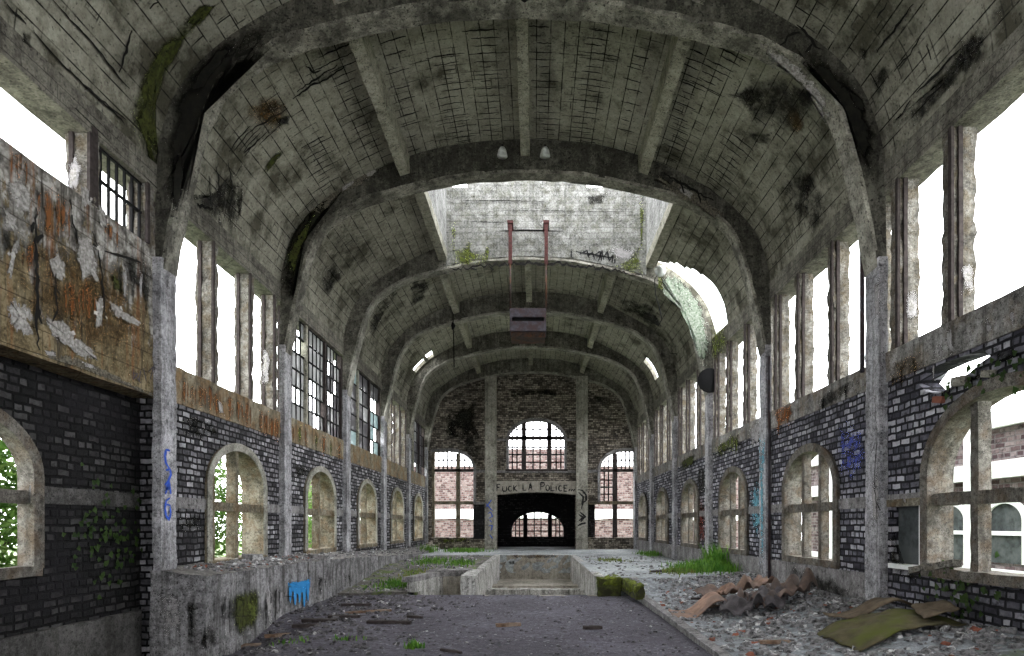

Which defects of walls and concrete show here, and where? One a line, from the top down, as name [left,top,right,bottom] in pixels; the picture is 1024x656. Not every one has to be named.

crack [7,0,132,125]
water stain [149,33,264,211]
crack [197,29,505,222]
water stain [729,81,814,143]
water stain [897,32,984,127]
peeling [3,179,31,283]
crack [31,208,61,350]
rust [21,245,128,354]
peeling [50,237,105,282]
peeling [7,296,154,397]
spalling [68,157,108,227]
water stain [284,200,334,294]